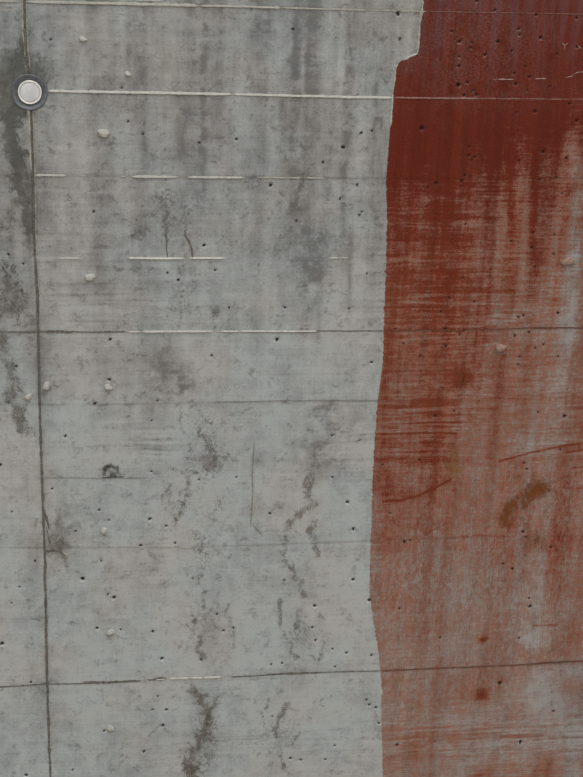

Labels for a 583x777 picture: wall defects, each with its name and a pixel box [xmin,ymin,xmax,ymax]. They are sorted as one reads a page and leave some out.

damp [0,30,42,130]
damp [10,139,36,250]
damp [5,362,32,433]